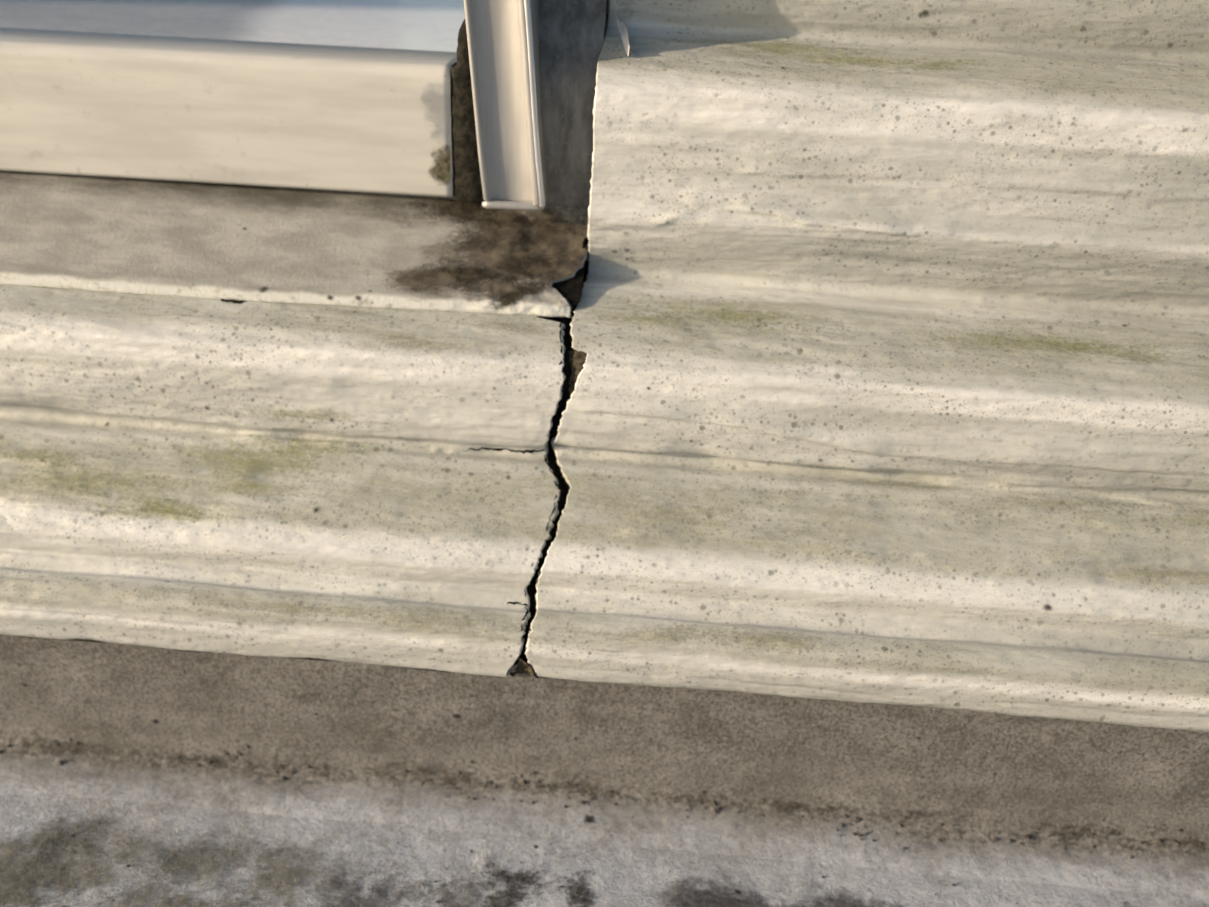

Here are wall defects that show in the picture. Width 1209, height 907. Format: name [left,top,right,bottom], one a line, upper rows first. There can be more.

water stain [410,200,550,230]
water stain [443,263,542,283]
crack [467,237,589,667]
water stain [0,820,313,907]
water stain [320,862,494,907]